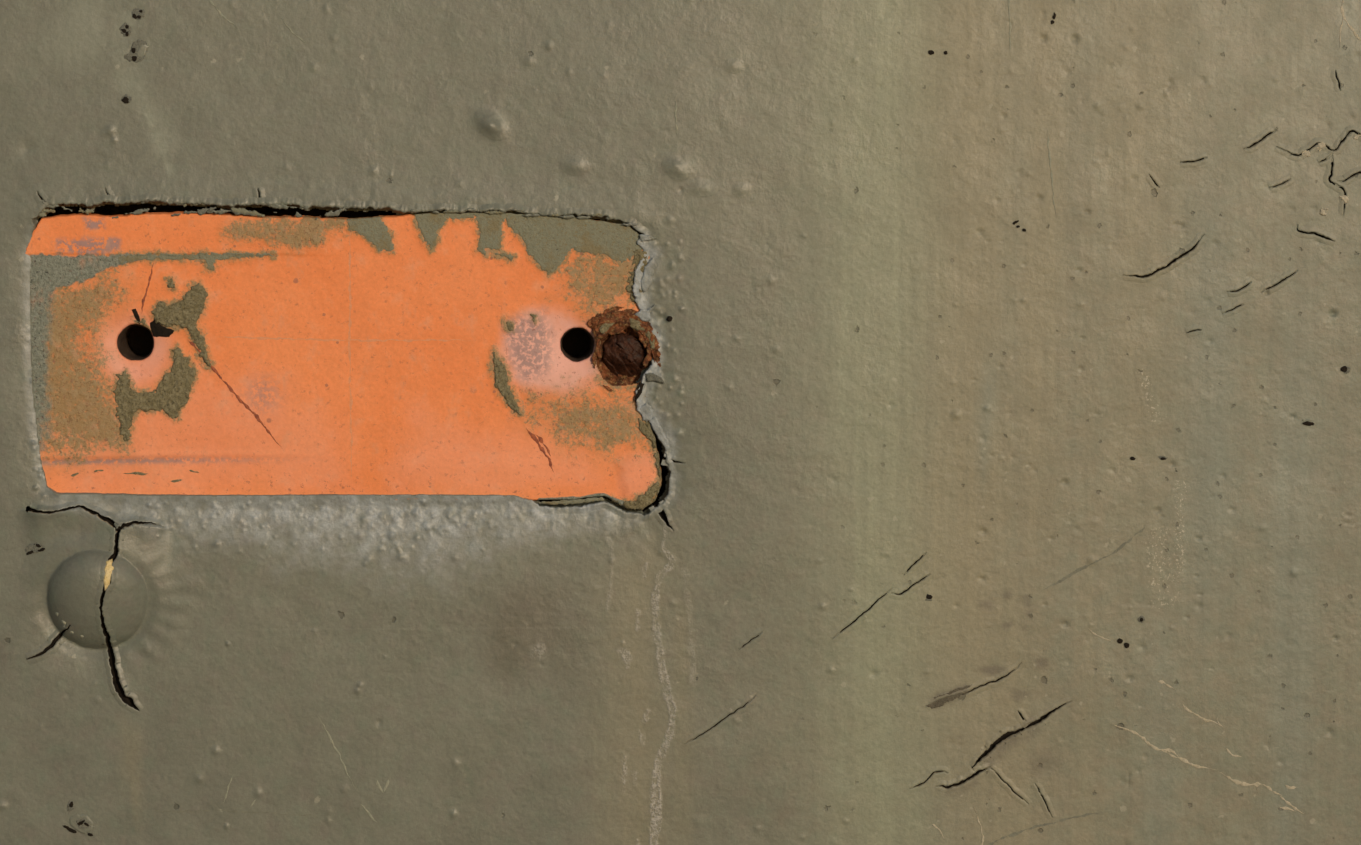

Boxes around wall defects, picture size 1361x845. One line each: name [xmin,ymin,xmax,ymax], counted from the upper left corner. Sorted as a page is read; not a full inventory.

crack [1330,69,1345,92]
crack [1123,231,1208,283]
crack [1145,153,1208,191]
crack [1185,125,1361,338]
peeling [25,199,673,510]
crack [25,500,166,714]
damp [16,220,699,845]
crack [829,548,934,643]
crack [682,691,759,748]
crack [909,658,1074,820]